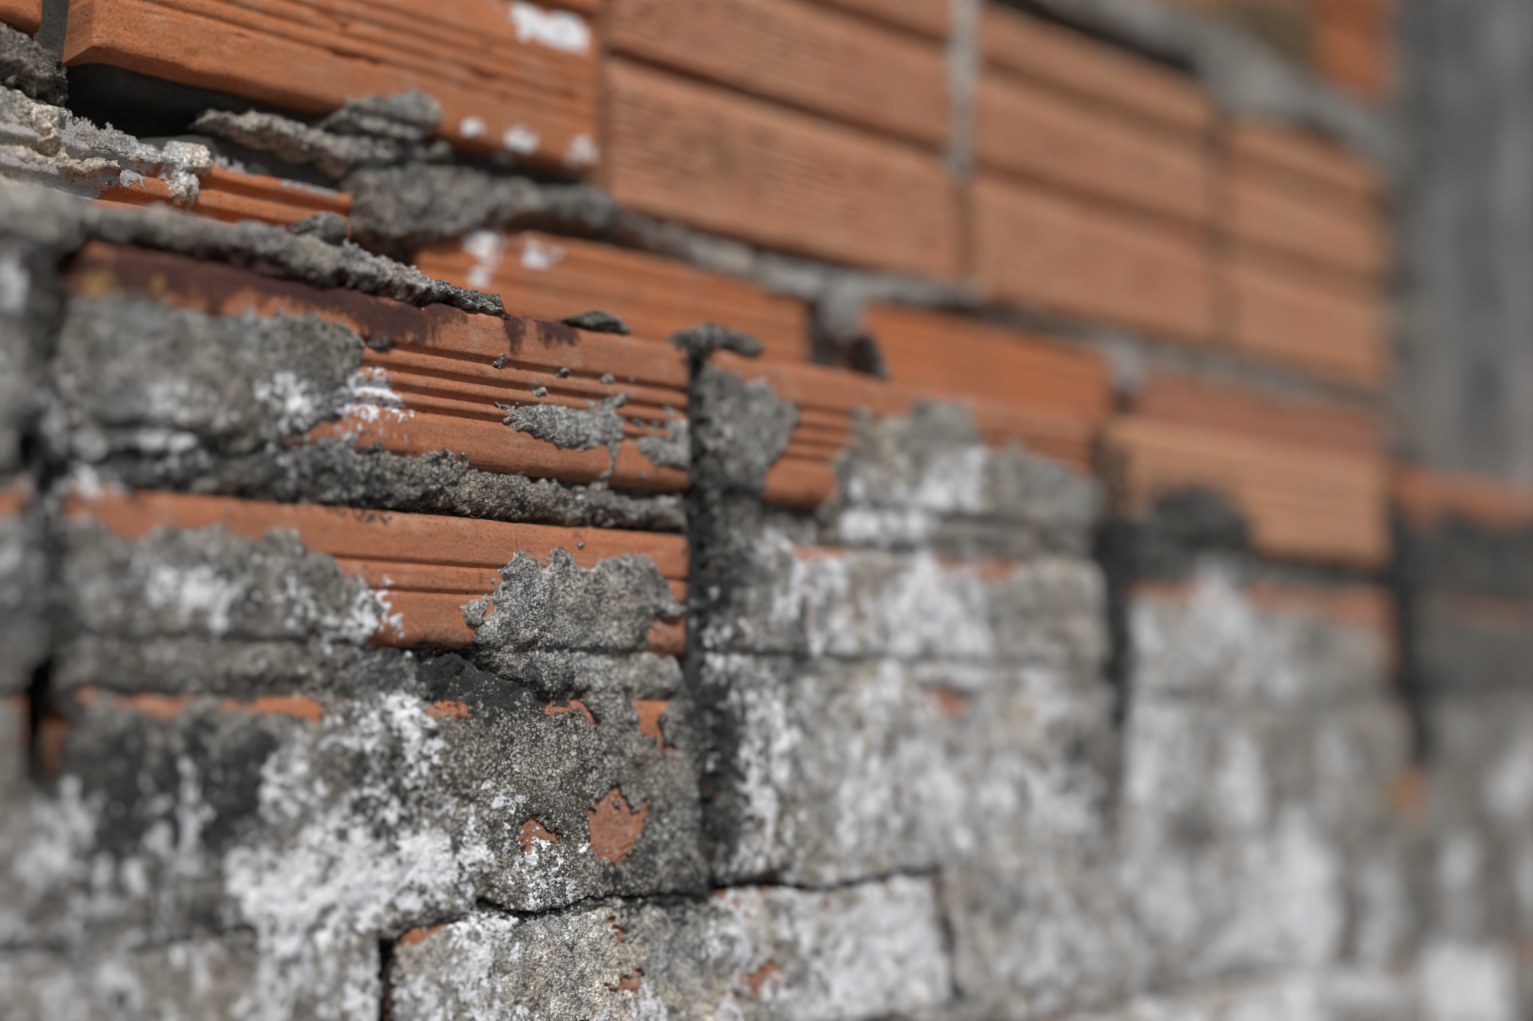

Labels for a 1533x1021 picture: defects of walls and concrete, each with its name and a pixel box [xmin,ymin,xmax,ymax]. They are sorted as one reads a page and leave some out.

peeling [0,238,394,484]
leakage [0,223,1515,1021]
peeling [0,360,1533,1021]
crack [376,937,396,1021]
crack [475,860,978,1021]